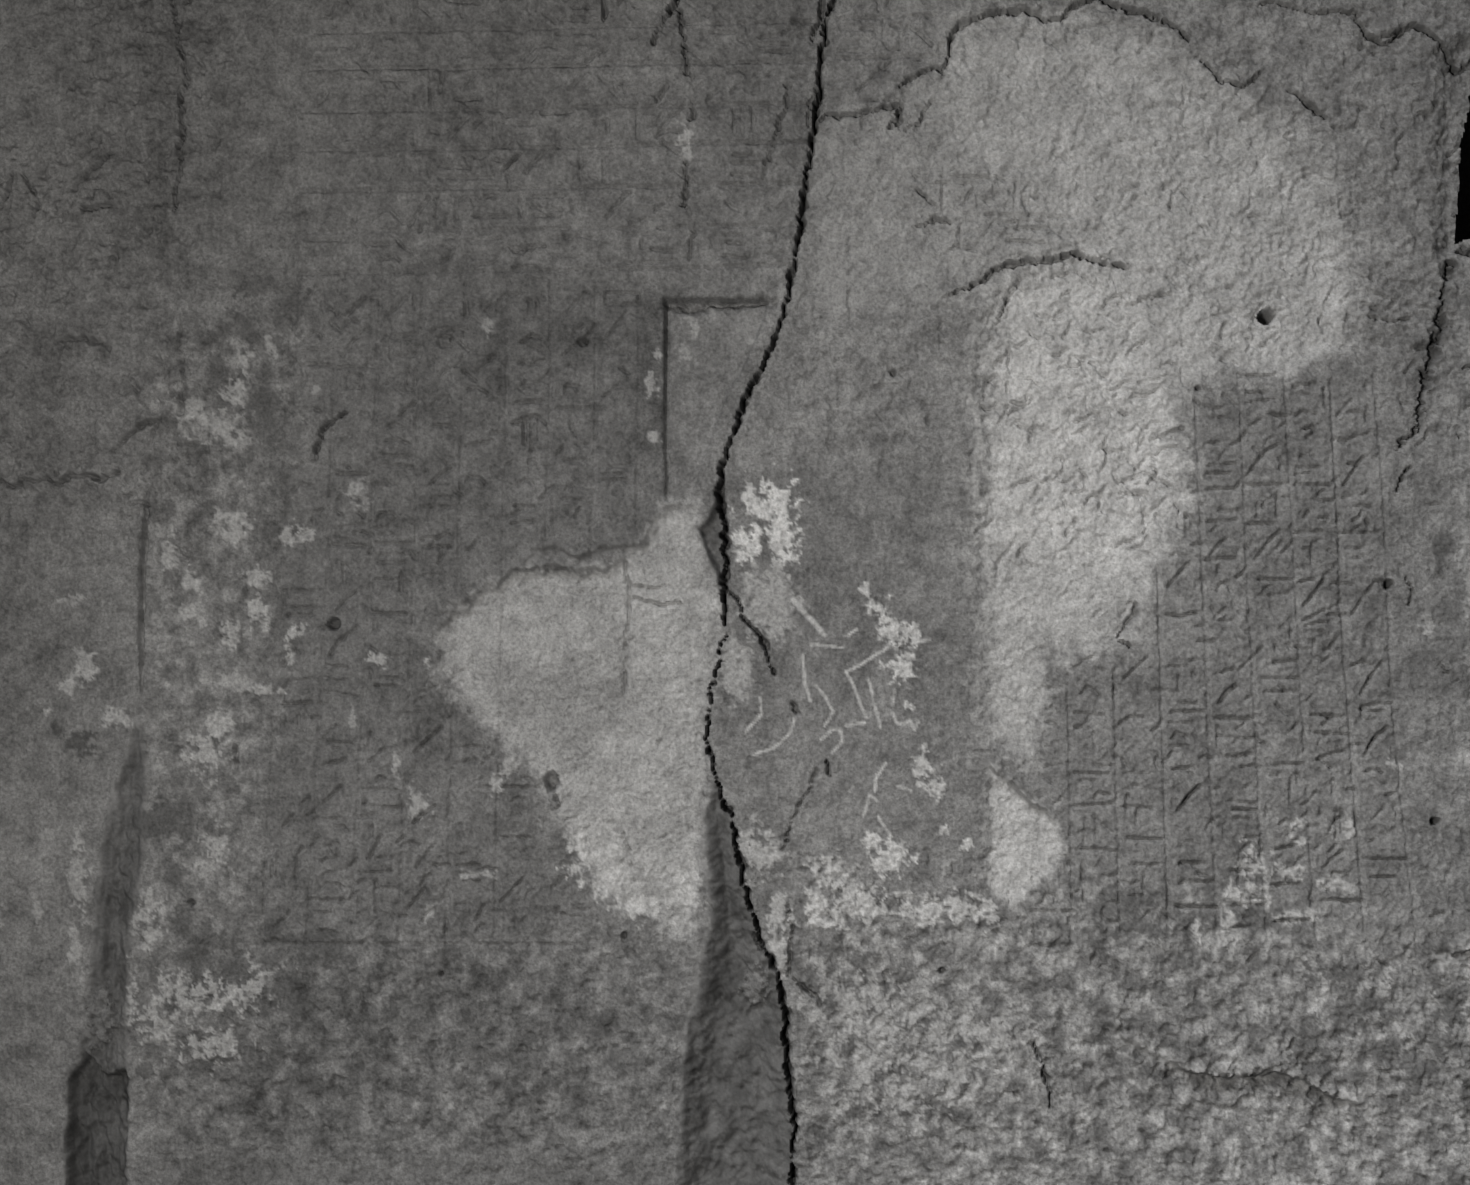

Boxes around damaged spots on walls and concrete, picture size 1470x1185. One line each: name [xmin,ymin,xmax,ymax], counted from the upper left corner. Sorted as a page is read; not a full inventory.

crack [1254,0,1470,77]
crack [1367,247,1470,494]
crack [620,0,1329,1185]